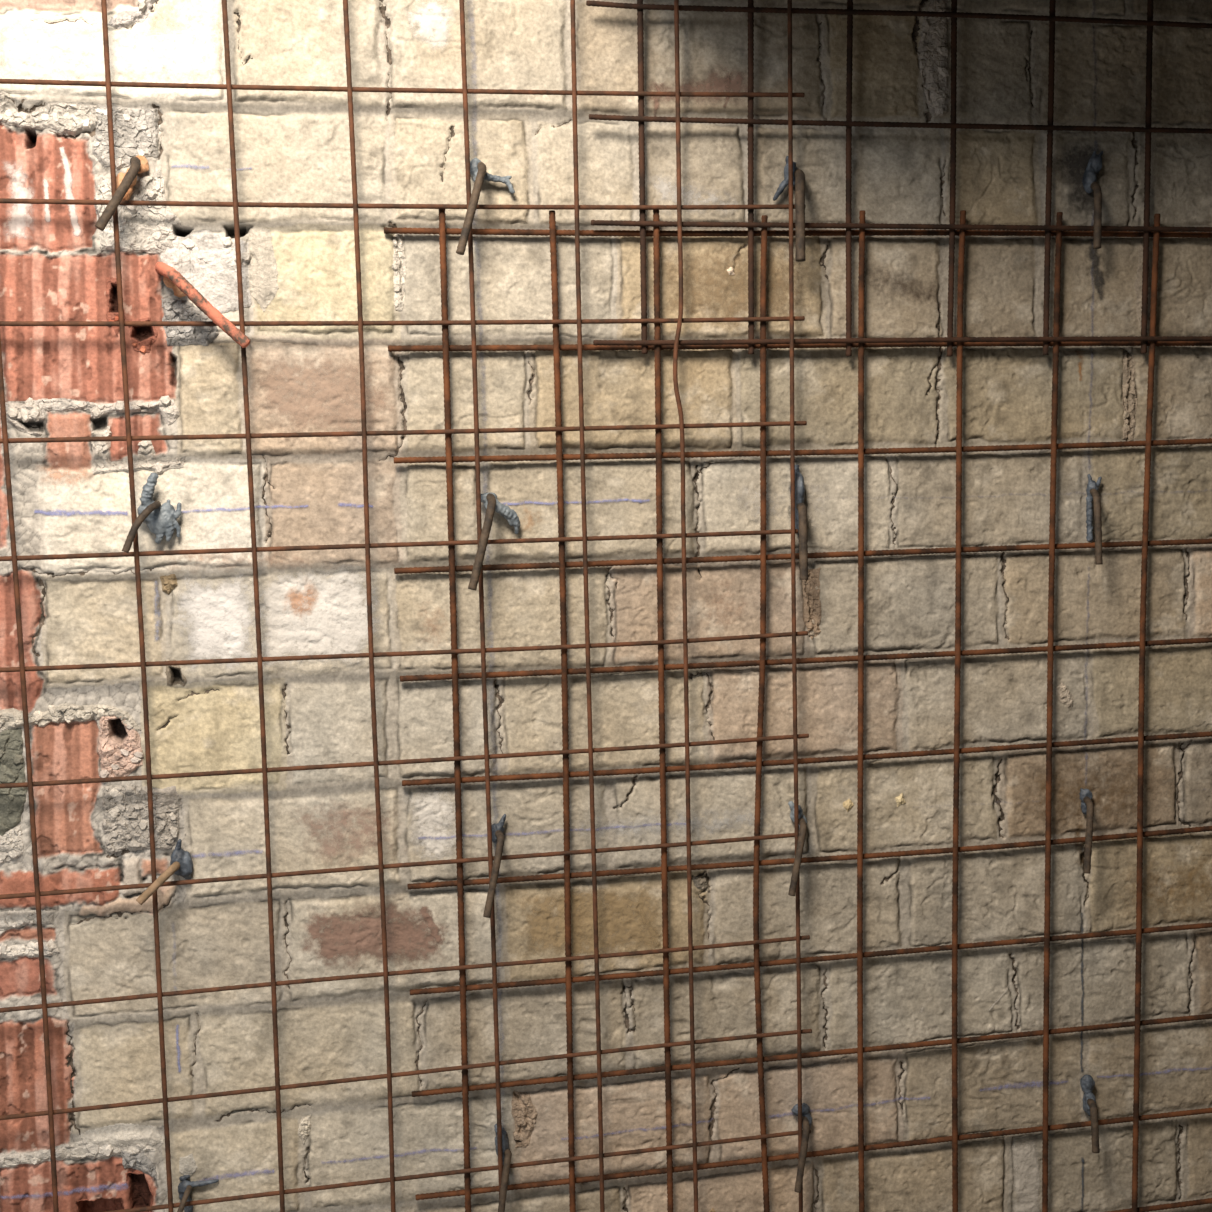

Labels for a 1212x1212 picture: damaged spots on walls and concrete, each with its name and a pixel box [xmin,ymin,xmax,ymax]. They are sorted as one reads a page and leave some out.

spalling [792,0,1212,357]
crack [527,361,535,405]
crack [926,303,943,441]
crack [890,466,898,544]
spalling [0,0,821,1212]
crack [689,672,715,740]
crack [991,759,1005,838]
spalling [795,341,1212,1212]
crack [1176,740,1193,827]
crack [415,1001,427,1086]
crack [623,985,636,1033]
crack [1009,953,1020,1029]